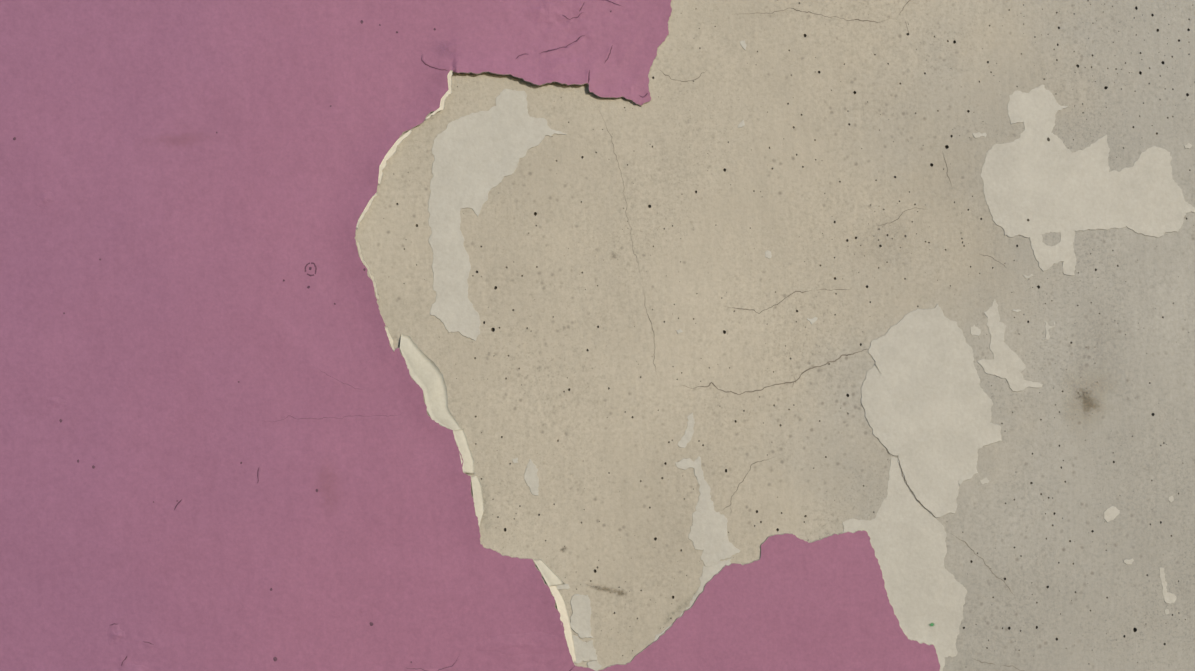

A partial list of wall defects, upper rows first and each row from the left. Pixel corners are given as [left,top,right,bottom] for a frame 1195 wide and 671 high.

peeling [0,0,672,671]
crack [686,349,880,395]
crack [729,288,852,314]
peeling [587,456,967,671]